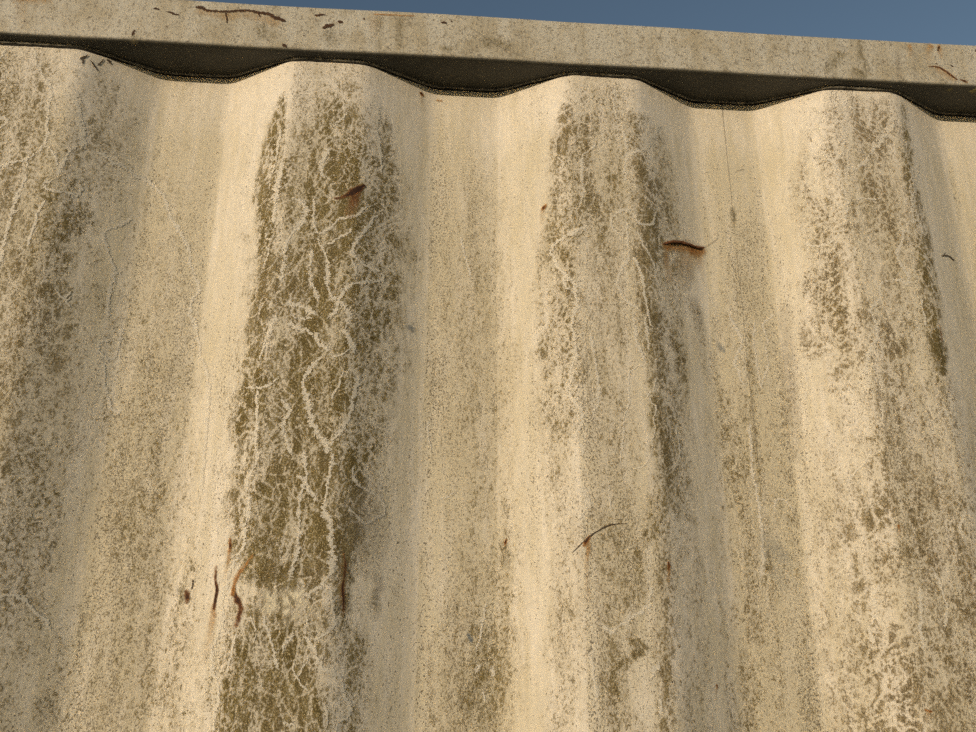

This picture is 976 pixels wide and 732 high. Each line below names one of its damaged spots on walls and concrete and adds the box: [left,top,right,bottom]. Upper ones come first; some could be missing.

water stain [0,48,422,732]
rust [231,555,253,627]
water stain [532,78,976,732]